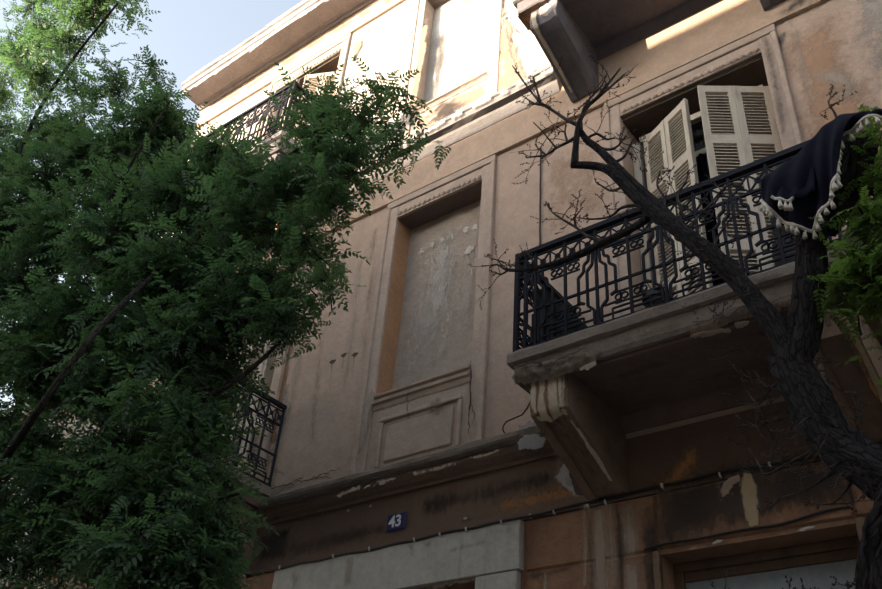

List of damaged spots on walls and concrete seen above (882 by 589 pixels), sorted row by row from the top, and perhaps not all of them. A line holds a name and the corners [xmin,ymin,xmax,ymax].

peeling [498,0,572,93]
spalling [689,303,753,339]
crack [467,363,475,434]
peeling [519,374,612,481]
spalling [292,462,456,502]
spalling [720,473,759,527]
leakage [583,504,657,589]